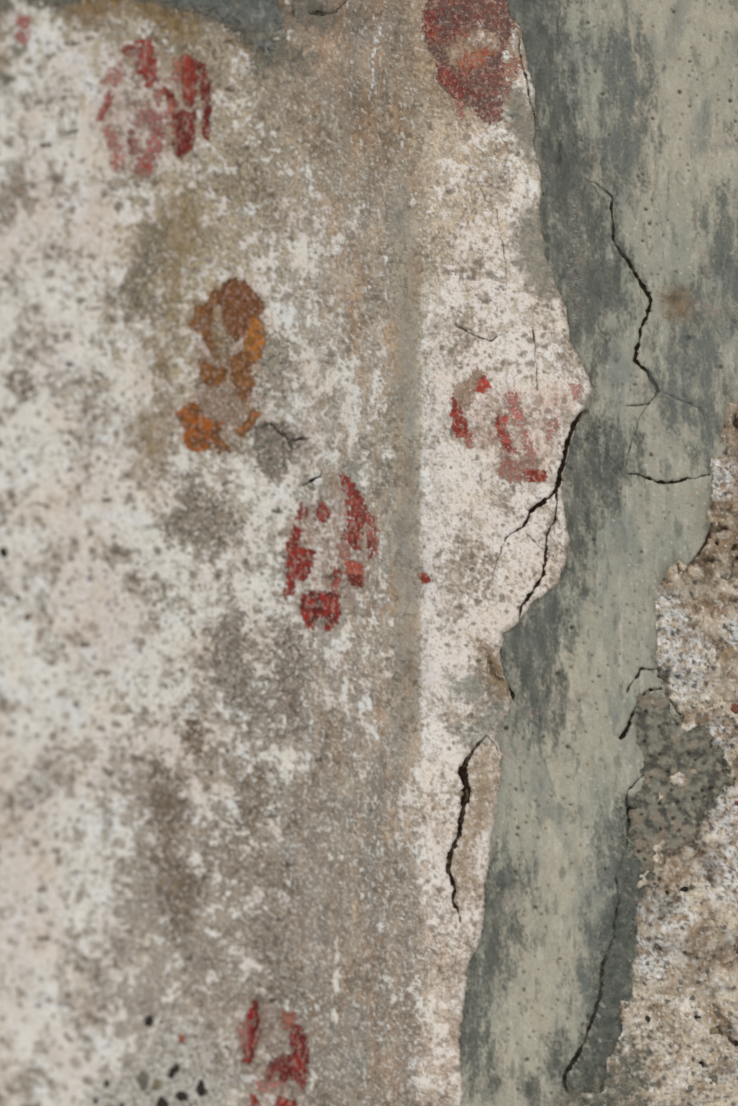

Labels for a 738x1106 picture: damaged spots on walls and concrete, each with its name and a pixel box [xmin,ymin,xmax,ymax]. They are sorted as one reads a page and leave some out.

flaking render [0,0,81,56]
peeling [96,37,212,177]
flaking render [130,0,287,58]
crack [595,183,690,406]
crack [500,410,584,617]
crack [619,432,710,484]
crack [446,735,495,922]
spalling [628,688,736,885]